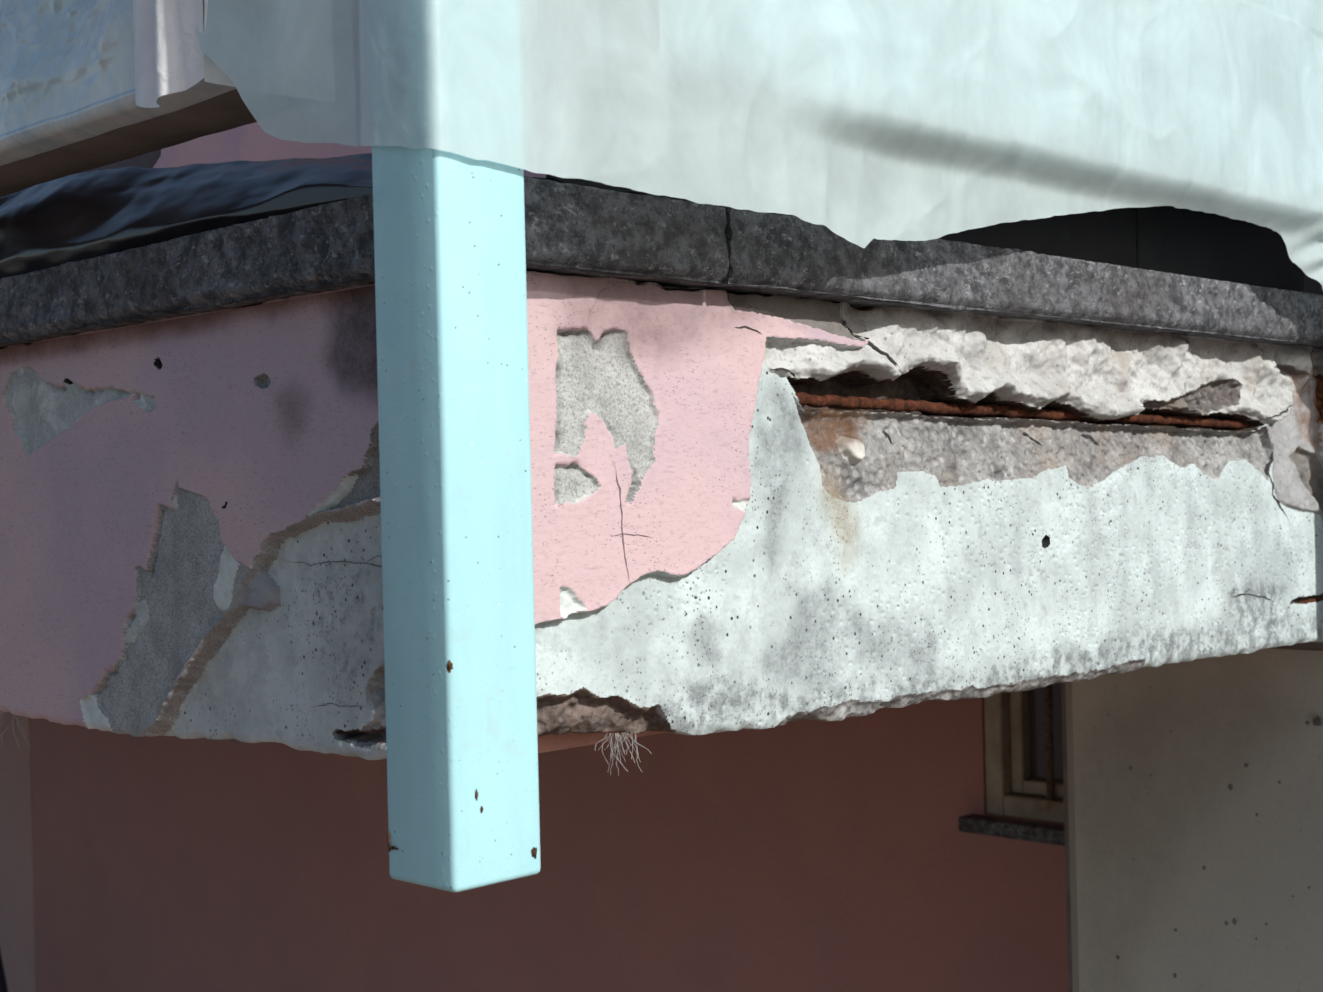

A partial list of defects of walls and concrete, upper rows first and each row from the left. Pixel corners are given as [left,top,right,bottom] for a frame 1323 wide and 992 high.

flaking render [727,293,866,342]
peeling [2,366,156,459]
peeling [554,329,659,505]
flaking render [80,422,387,760]
flaking render [535,364,1323,737]